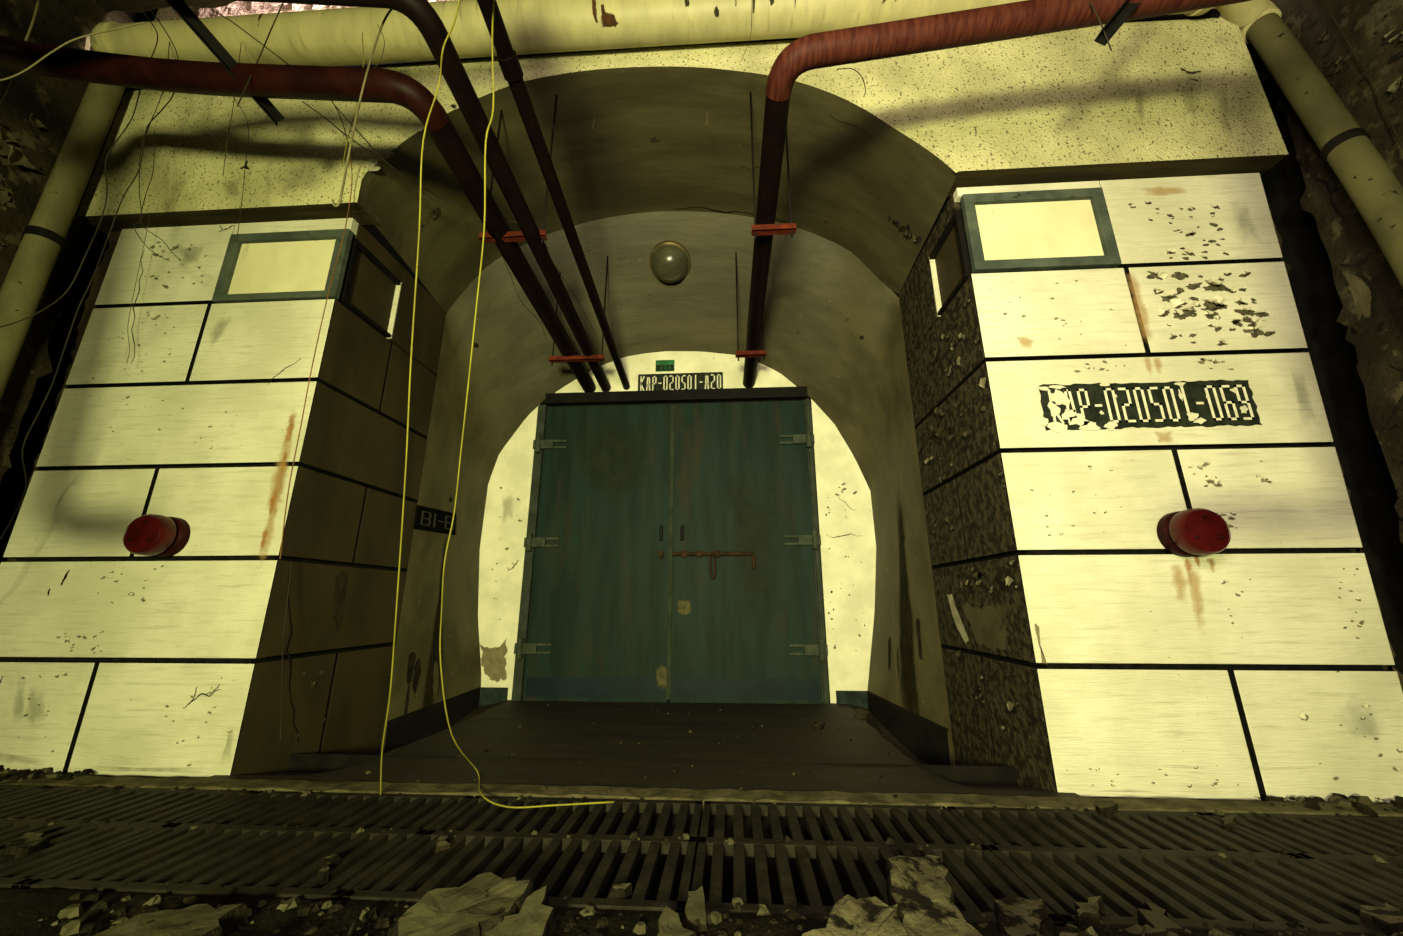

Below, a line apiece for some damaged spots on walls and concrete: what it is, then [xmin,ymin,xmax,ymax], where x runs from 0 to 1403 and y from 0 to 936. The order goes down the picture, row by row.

peeling [1128,200,1275,370]